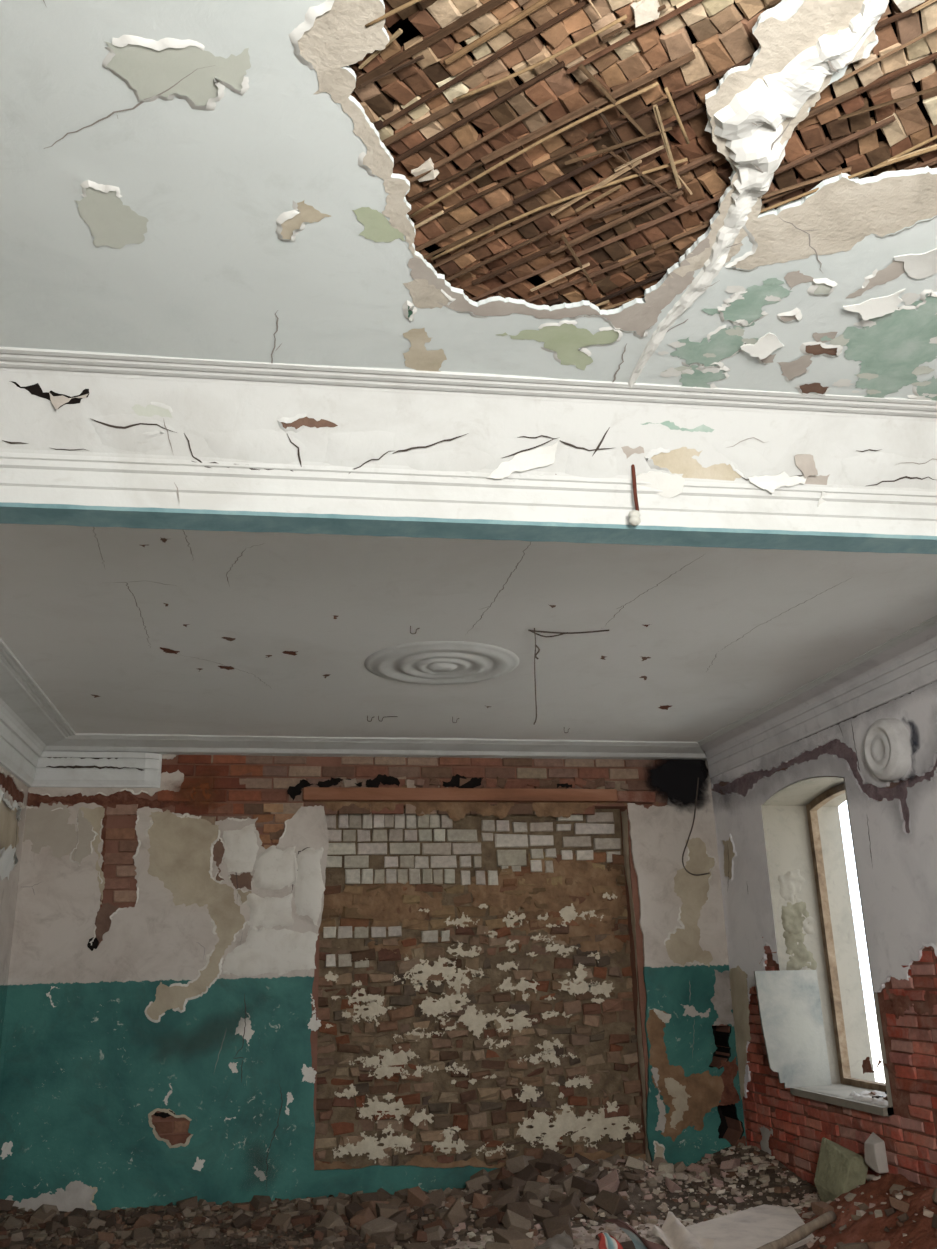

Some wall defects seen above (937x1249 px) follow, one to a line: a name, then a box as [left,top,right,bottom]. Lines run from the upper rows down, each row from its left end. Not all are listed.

crack [44,65,215,149]
peeling [102,35,251,111]
peeling [74,180,149,249]
peeling [275,201,331,241]
spalling [289,0,864,372]
spalling [658,0,937,408]
crack [350,434,466,473]
spalling [451,440,559,482]
spalling [621,446,838,507]
crack [798,683,932,869]
spalling [0,755,668,1023]
spalling [646,833,937,1188]